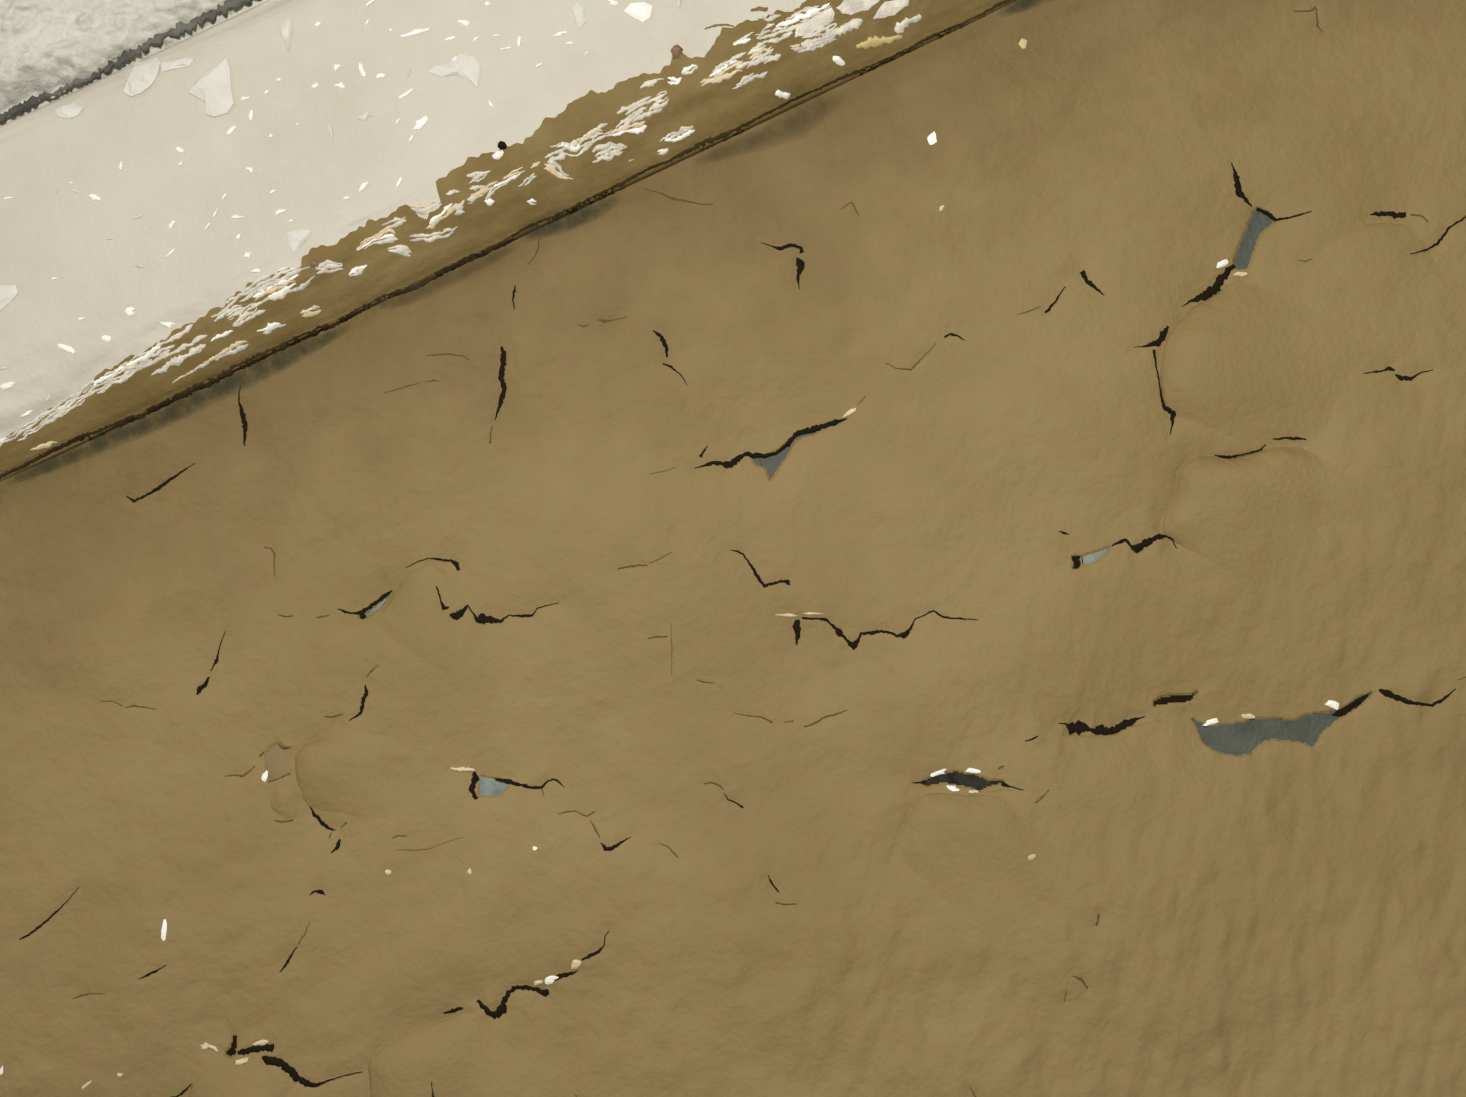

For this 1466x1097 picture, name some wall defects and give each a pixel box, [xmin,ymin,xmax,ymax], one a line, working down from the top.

peeling [0,0,922,450]
spalling [1181,162,1312,307]
spalling [694,396,866,480]
crack [406,558,558,624]
crack [732,550,978,650]
crack [1025,716,1145,742]
spalling [1154,693,1370,756]
crack [1379,677,1465,707]
spalling [451,767,564,800]
spalling [913,765,1049,803]
crack [443,931,609,1019]
crack [261,1055,363,1087]